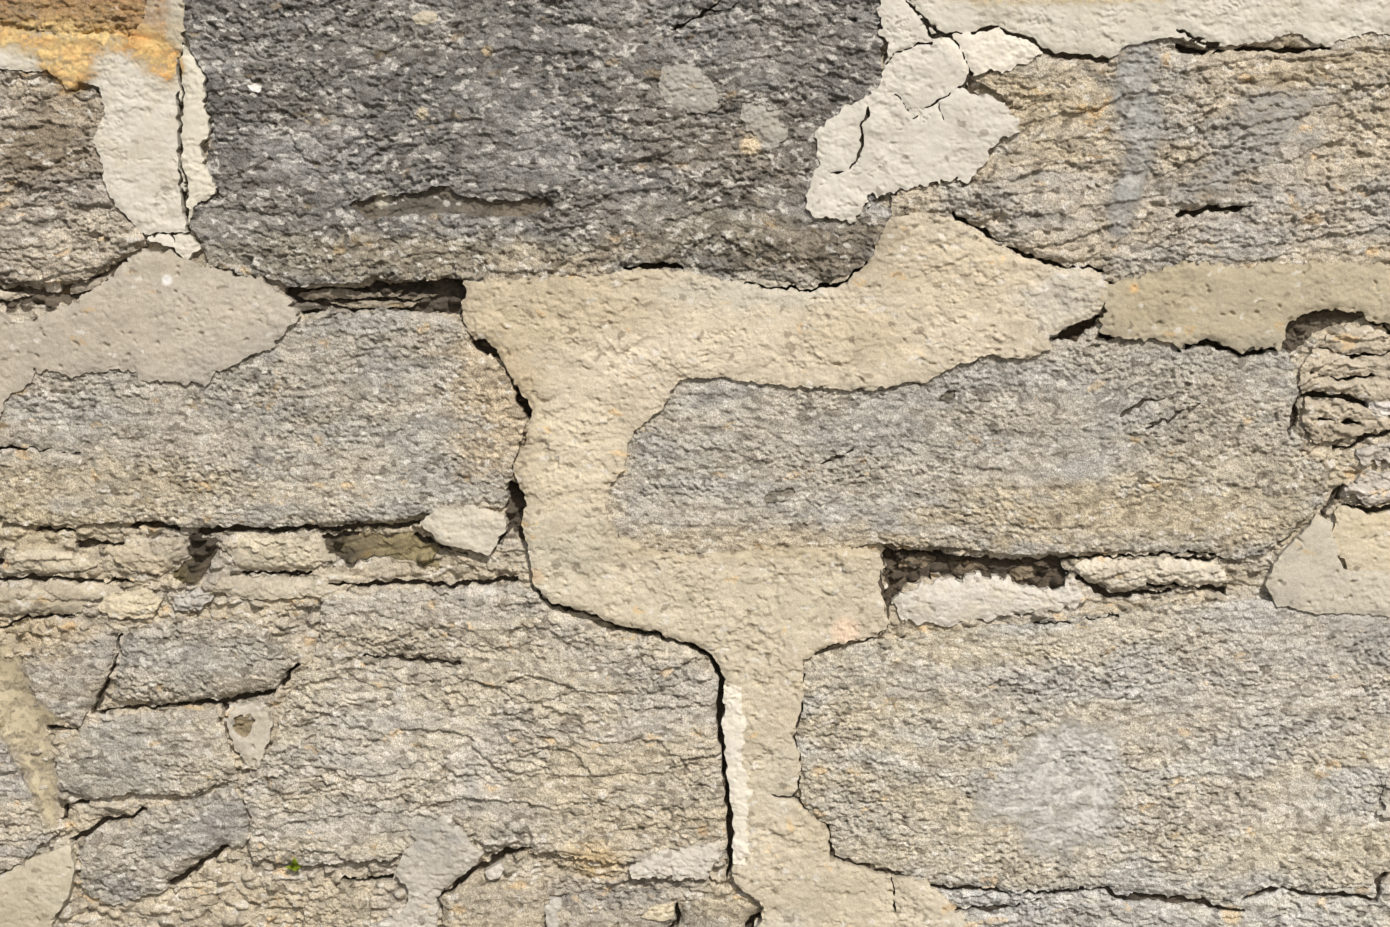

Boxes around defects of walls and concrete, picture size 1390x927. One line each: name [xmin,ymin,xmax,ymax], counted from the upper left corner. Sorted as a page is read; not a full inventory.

peeling [805,0,1390,224]
crack [541,594,734,876]
crack [774,554,1387,912]
crack [745,912,761,927]